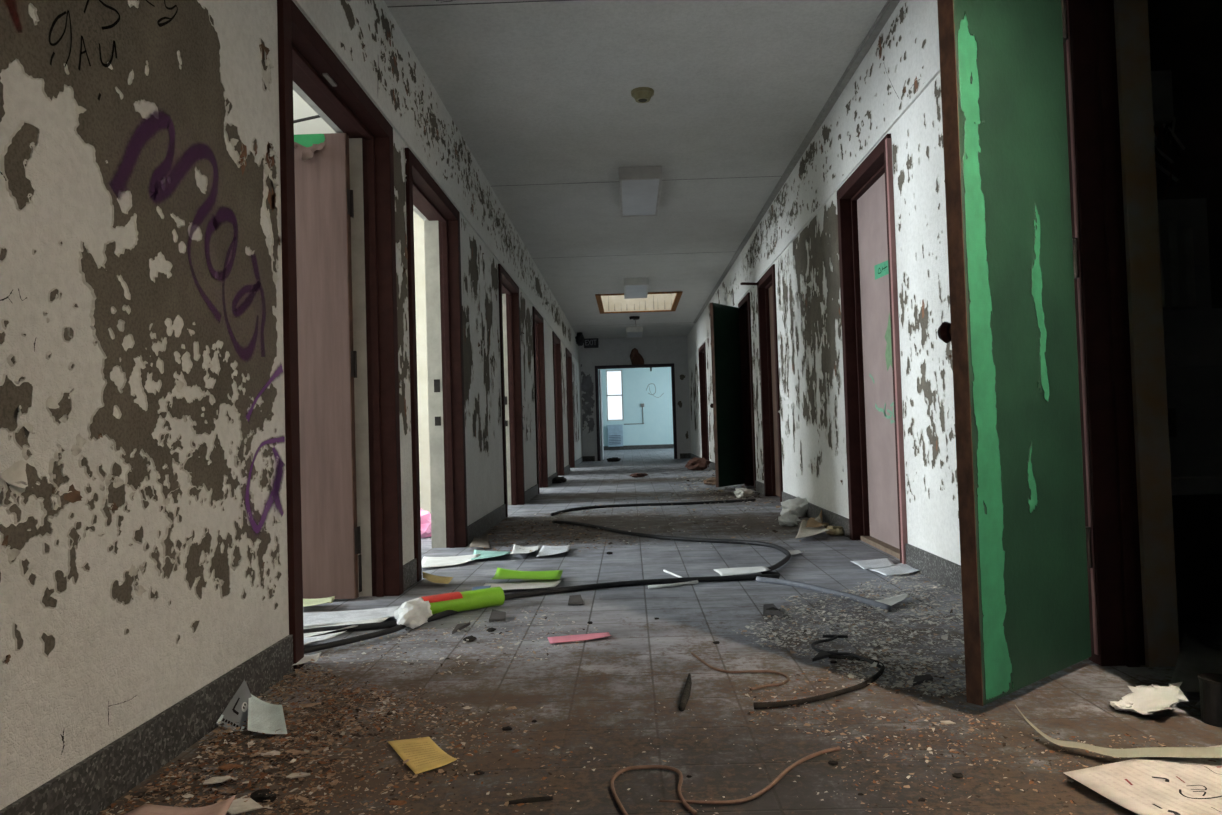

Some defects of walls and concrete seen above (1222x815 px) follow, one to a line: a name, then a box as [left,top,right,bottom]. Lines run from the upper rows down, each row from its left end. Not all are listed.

peeling [0,0,288,610]
peeling [340,0,595,456]
peeling [708,2,959,519]
peeling [0,622,24,664]
peeling [39,631,55,657]
peeling [176,619,200,644]